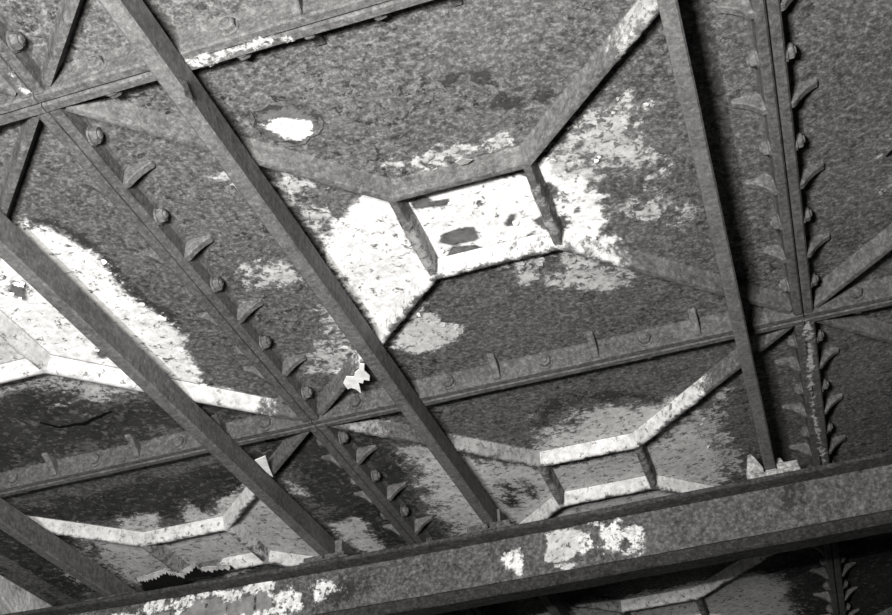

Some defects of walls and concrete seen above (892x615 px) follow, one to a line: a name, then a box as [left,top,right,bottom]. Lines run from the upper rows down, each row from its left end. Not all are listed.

spalling [249,99,325,148]
spalling [207,172,236,193]
spalling [10,280,26,300]
peeling [388,313,464,354]
peeling [343,363,370,393]
peeling [544,518,645,570]
peeling [500,547,524,576]
peeling [112,562,303,615]
peeling [313,579,343,603]